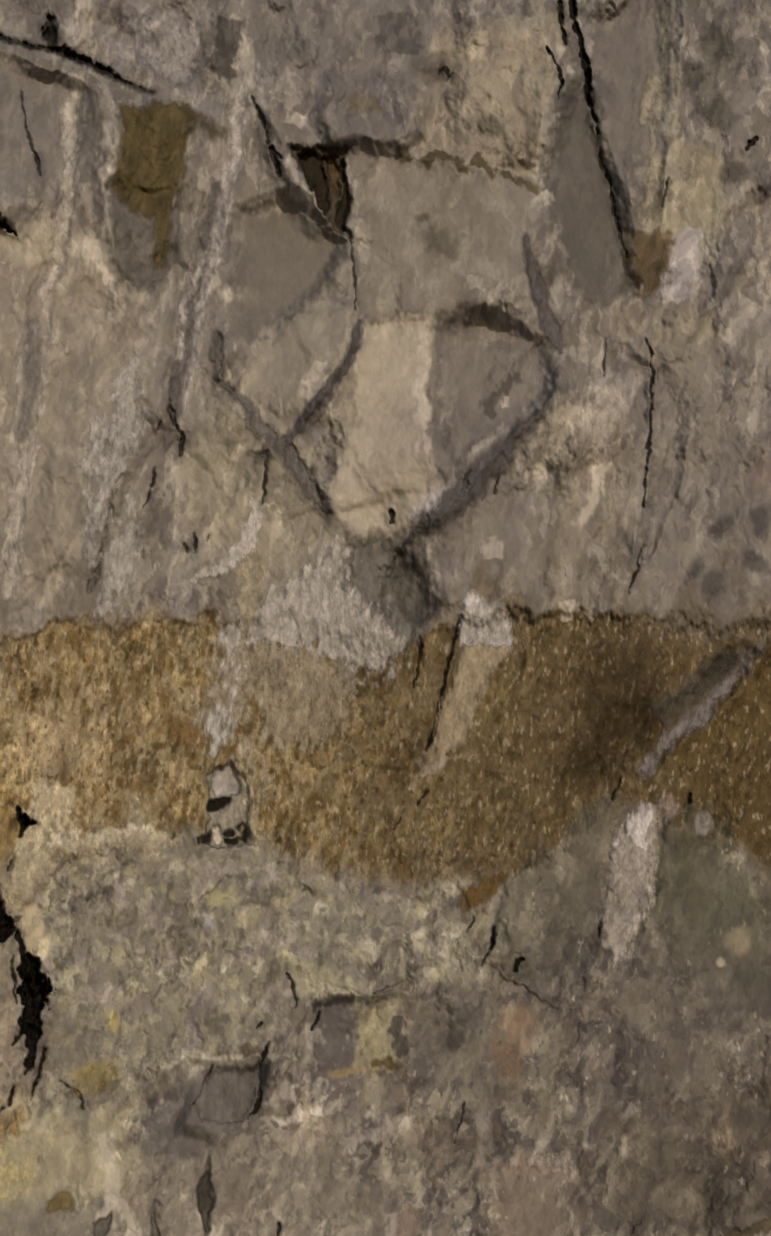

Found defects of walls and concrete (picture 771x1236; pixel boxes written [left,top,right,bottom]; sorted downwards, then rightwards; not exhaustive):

crack [546,0,627,259]
crack [0,213,17,236]
spalling [289,144,352,233]
crack [642,338,655,507]
crack [629,545,646,593]
damp [460,592,513,650]
damp [190,497,411,845]
crack [7,807,37,871]
damp [3,830,178,928]
damp [612,790,679,958]
crack [0,900,84,1111]